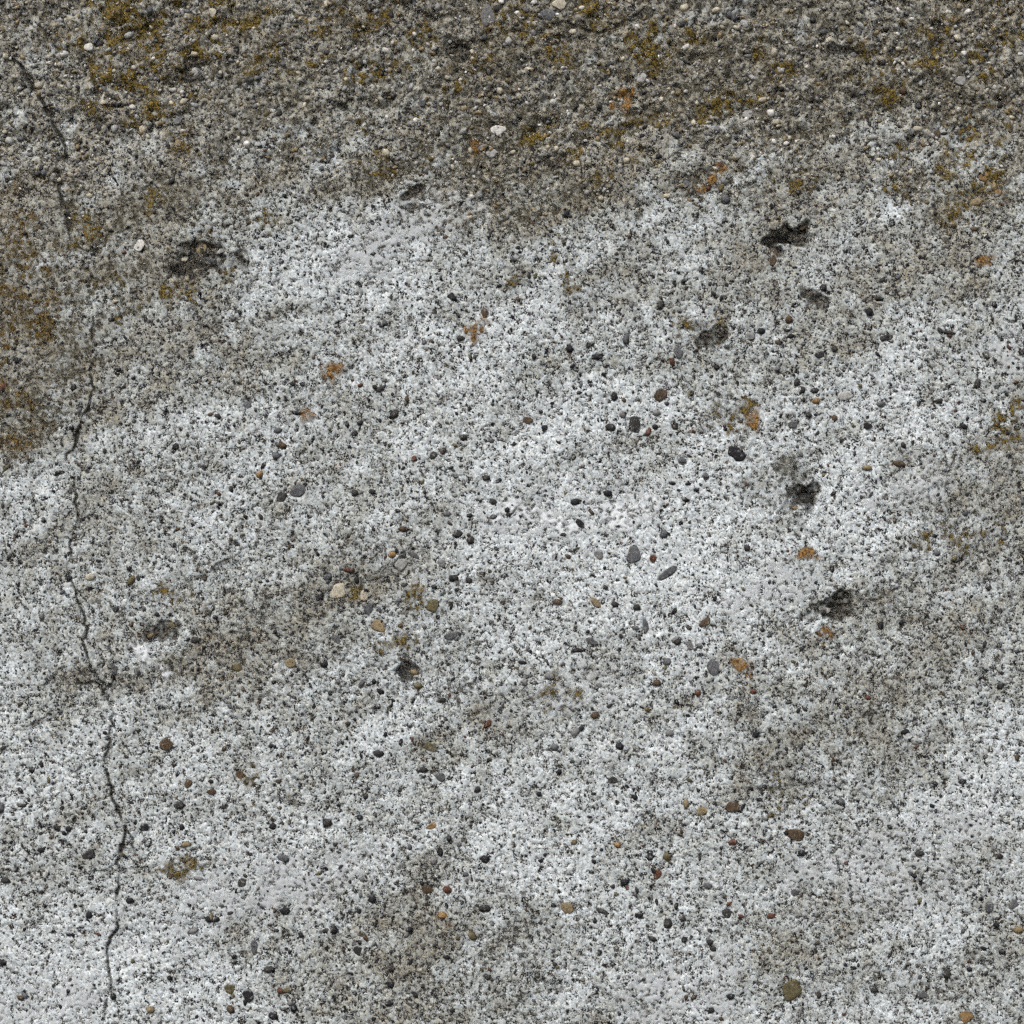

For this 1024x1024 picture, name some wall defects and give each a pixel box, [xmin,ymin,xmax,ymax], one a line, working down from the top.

crack [13,59,98,252]
crack [43,355,115,690]
crack [92,718,145,896]
crack [103,922,119,1020]